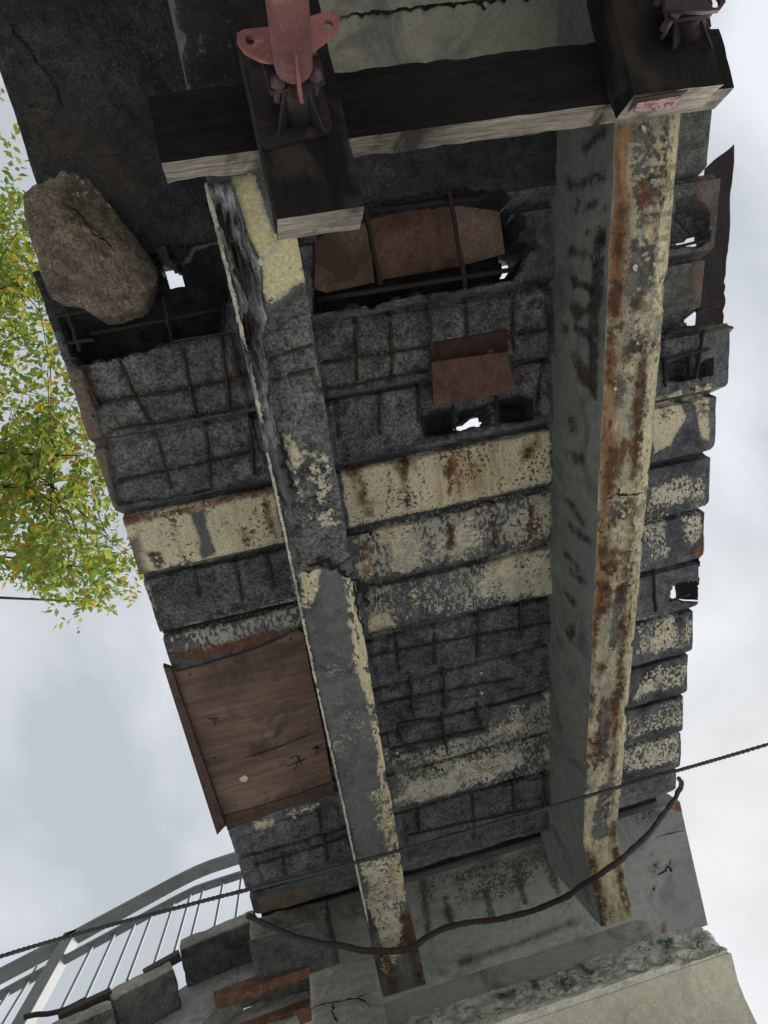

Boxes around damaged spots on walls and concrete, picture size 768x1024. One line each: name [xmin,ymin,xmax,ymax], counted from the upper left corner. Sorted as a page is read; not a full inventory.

crack [339,0,538,20]
crack [10,24,63,106]
damp [568,228,606,400]
rust [394,450,412,507]
rust [443,463,456,495]
rust [575,128,664,806]
peeling [591,113,719,845]
spalling [55,173,553,975]
rust [587,853,608,926]
rust [609,822,631,912]
crack [309,994,371,1023]